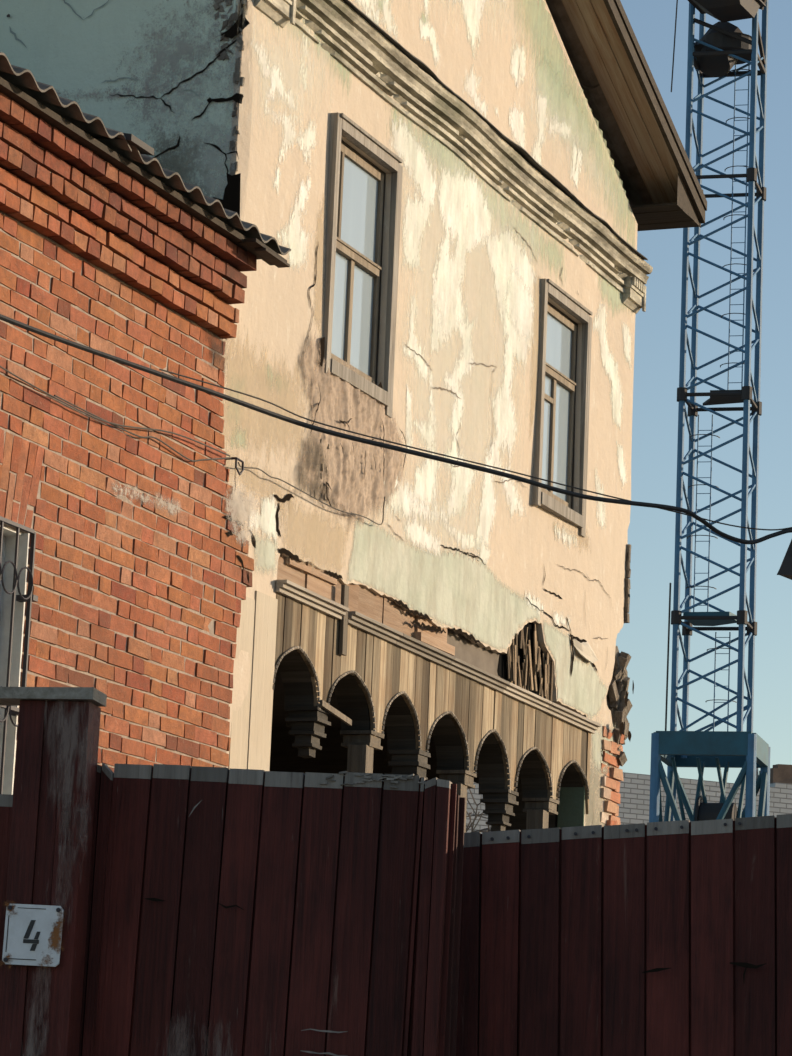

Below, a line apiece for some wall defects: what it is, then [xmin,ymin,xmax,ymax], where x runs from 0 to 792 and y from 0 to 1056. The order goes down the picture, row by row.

crack [64,0,109,20]
peeling [350,0,398,42]
peeling [419,0,440,68]
crack [102,40,244,158]
peeling [449,0,582,189]
crack [205,143,239,173]
crack [301,241,319,378]
crack [405,344,459,398]
peeling [222,120,634,827]